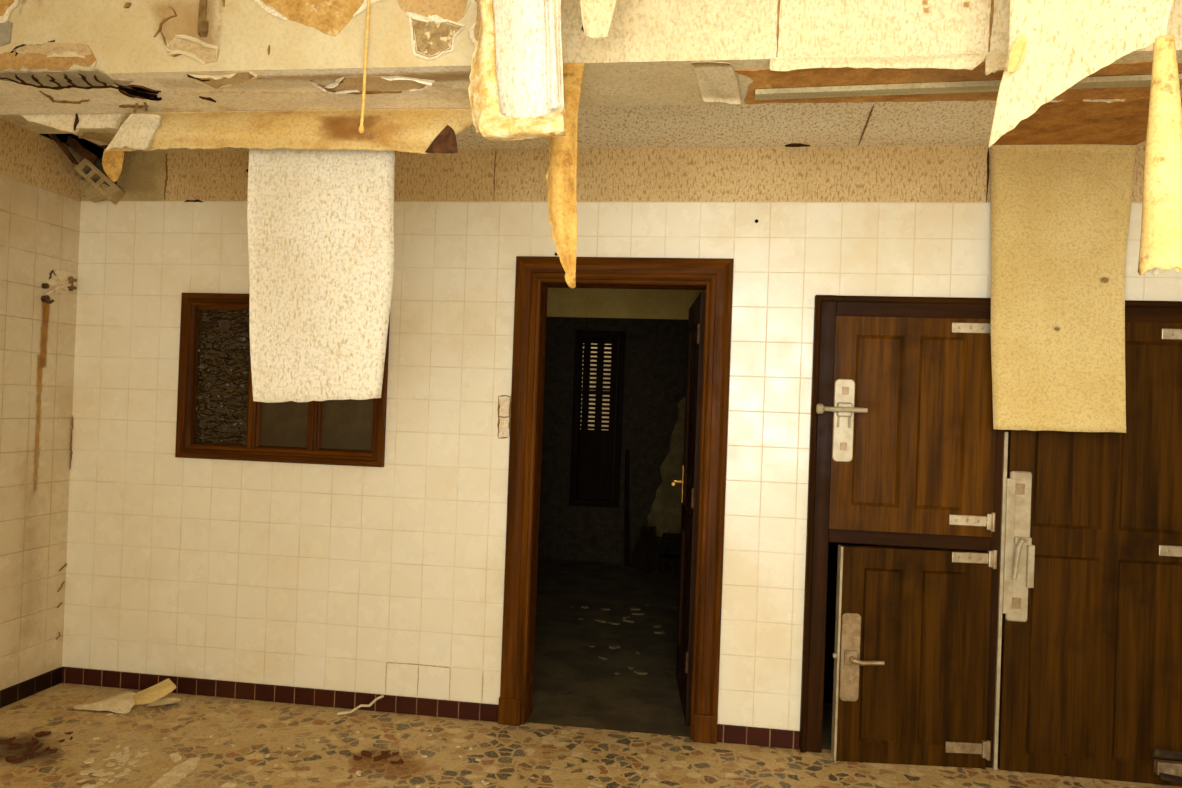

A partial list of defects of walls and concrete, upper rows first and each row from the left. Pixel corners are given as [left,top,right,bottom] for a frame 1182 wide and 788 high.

peeling [0,0,481,186]
peeling [734,62,1004,104]
peeling [993,61,1152,148]